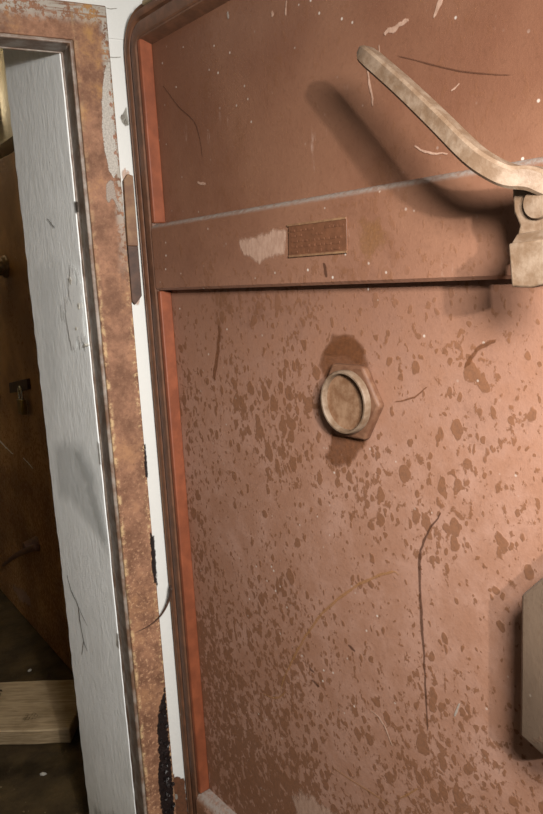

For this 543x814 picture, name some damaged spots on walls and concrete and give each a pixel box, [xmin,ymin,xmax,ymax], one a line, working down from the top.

corrosion [150,533,158,585]